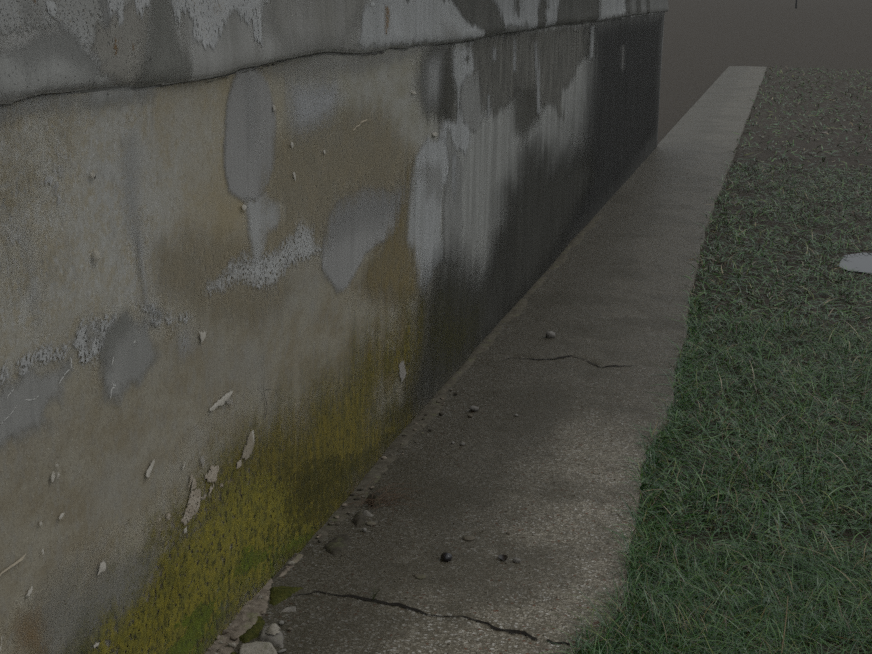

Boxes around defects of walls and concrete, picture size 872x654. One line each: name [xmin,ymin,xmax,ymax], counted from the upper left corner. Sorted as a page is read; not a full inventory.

water stain [92,0,186,85]
crack [0,16,628,106]
spalling [236,430,255,469]
spalling [181,456,223,533]
crack [294,591,571,645]